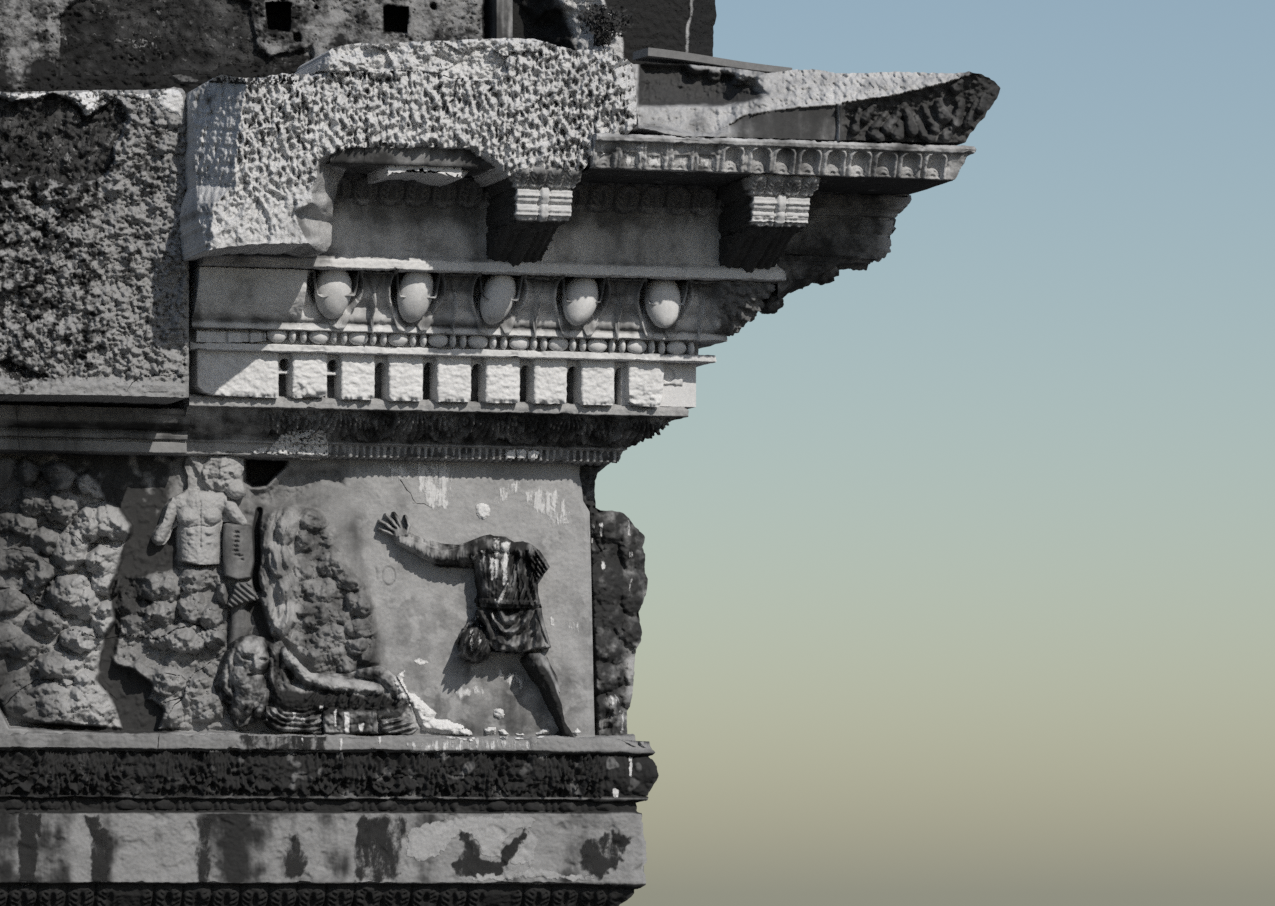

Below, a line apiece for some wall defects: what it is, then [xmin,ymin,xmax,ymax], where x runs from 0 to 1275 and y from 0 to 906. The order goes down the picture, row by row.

flaking render [0,0,304,185]
damp [196,818,211,884]
damp [354,814,406,882]